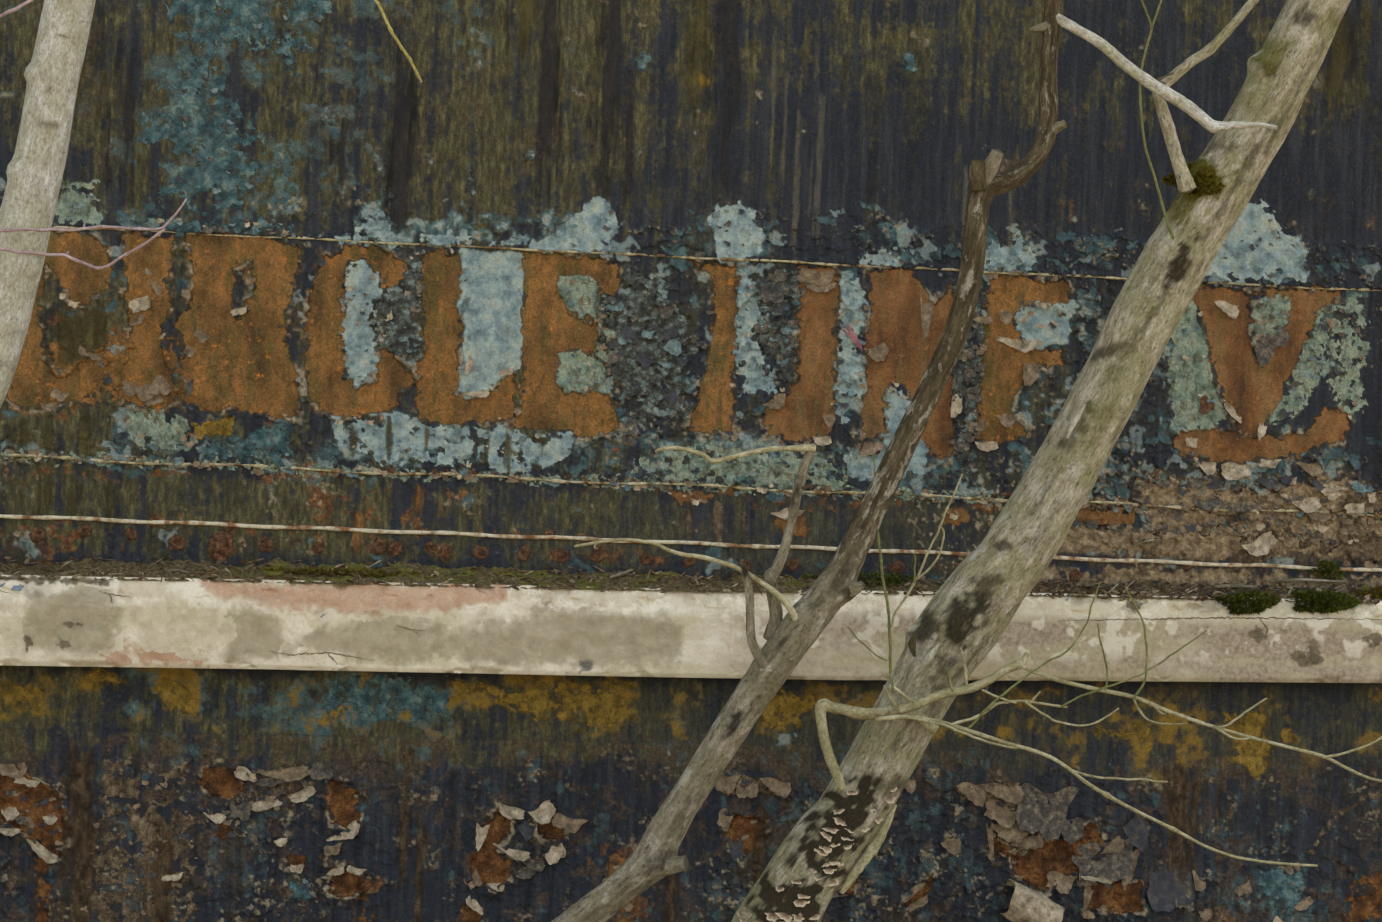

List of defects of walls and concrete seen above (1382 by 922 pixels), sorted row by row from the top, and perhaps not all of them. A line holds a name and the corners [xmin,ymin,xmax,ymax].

peeling [52,178,106,237]
peeling [0,196,911,538]
peeling [894,231,1079,526]
peeling [1038,199,1382,601]
rust [0,575,109,586]
peeling [69,758,367,922]
peeling [457,800,588,922]
peeling [715,774,792,862]
peeling [904,779,916,794]
peeling [941,835,961,855]
peeling [956,781,1314,922]